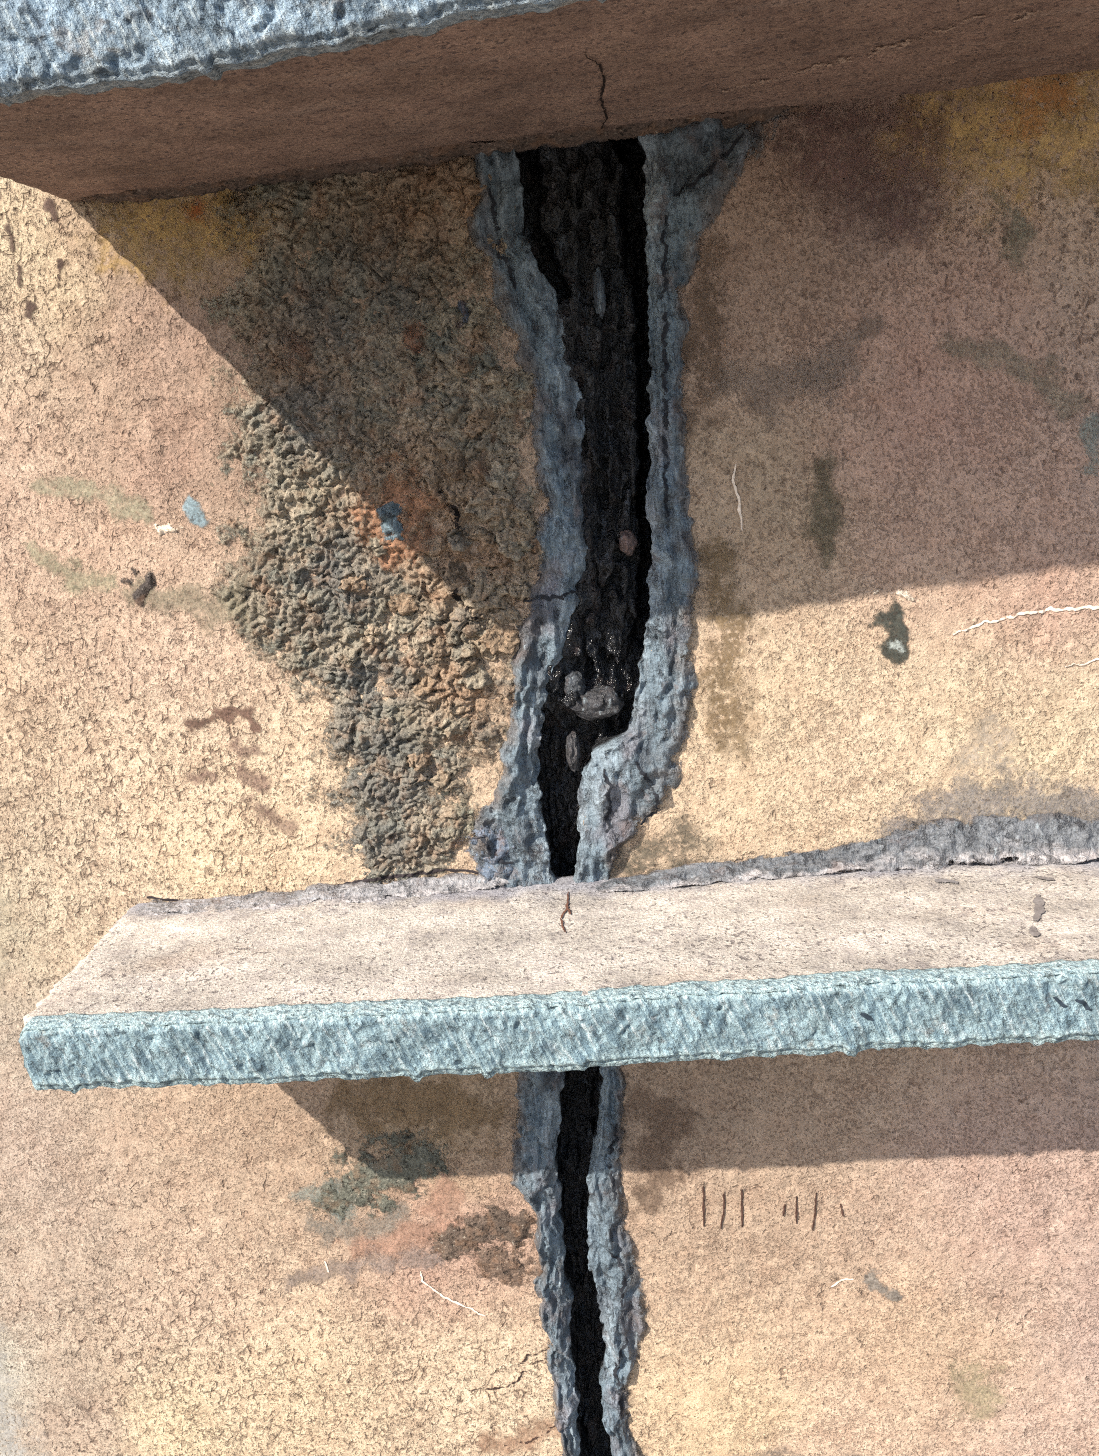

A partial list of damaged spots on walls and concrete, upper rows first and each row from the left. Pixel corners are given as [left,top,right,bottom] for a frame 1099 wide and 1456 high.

crack [337,54,793,932]
crack [147,894,179,902]
crack [469,1065,649,1456]